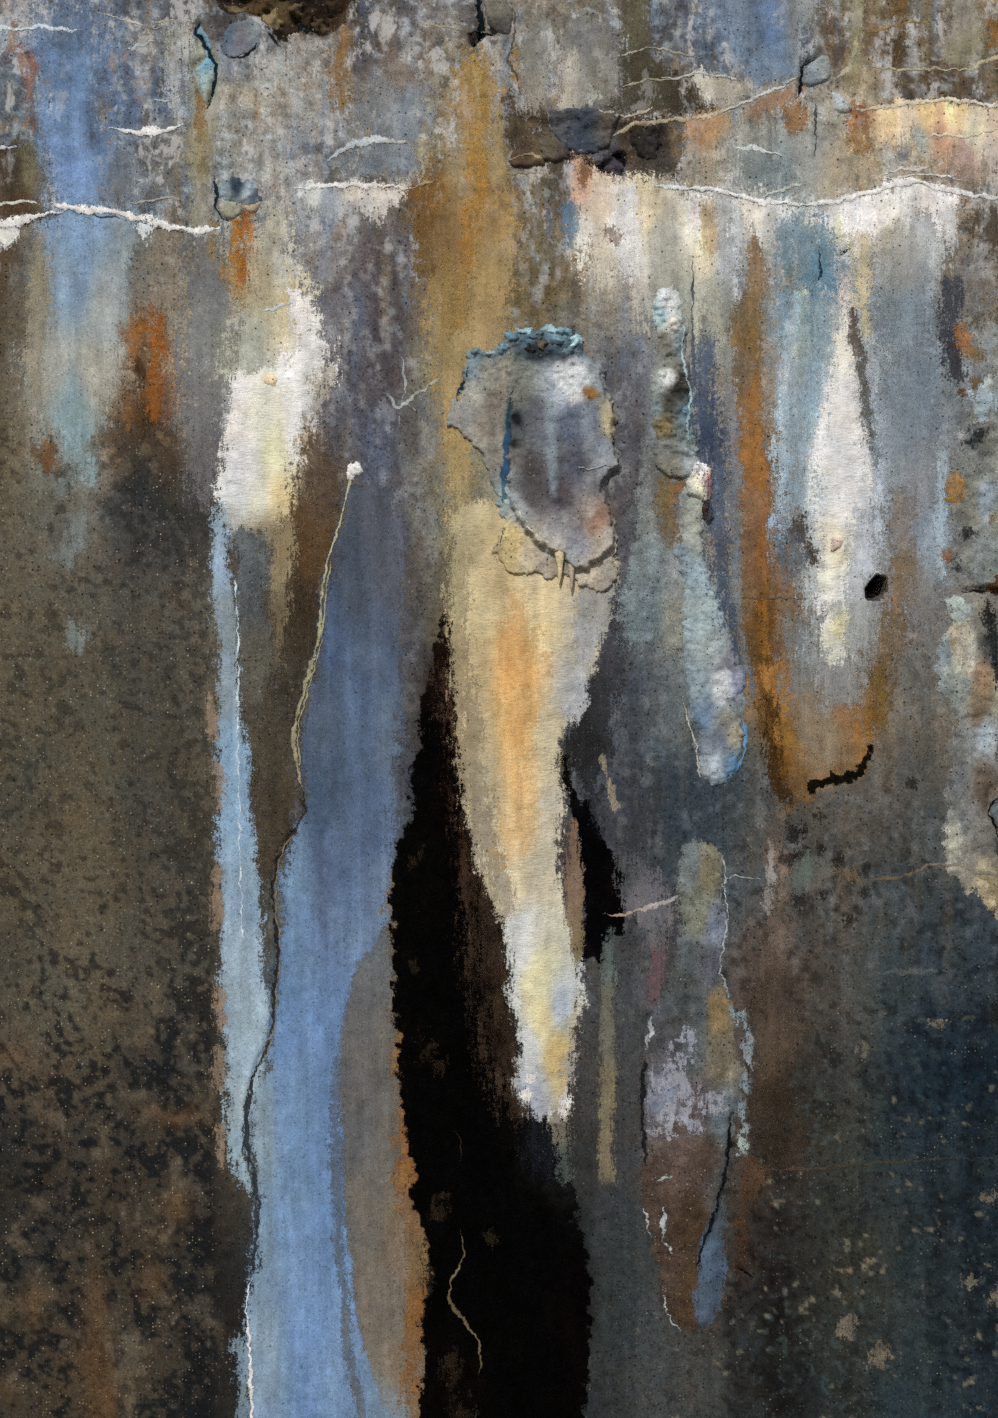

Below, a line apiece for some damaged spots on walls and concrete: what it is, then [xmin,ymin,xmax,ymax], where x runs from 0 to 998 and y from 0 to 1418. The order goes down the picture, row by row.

crack [0,196,221,252]
rust [397,36,532,551]
spalling [498,88,691,183]
crack [883,172,960,180]
leakage [0,0,440,1418]
crack [241,478,351,1418]
rust [726,232,920,1177]
crack [866,862,998,911]